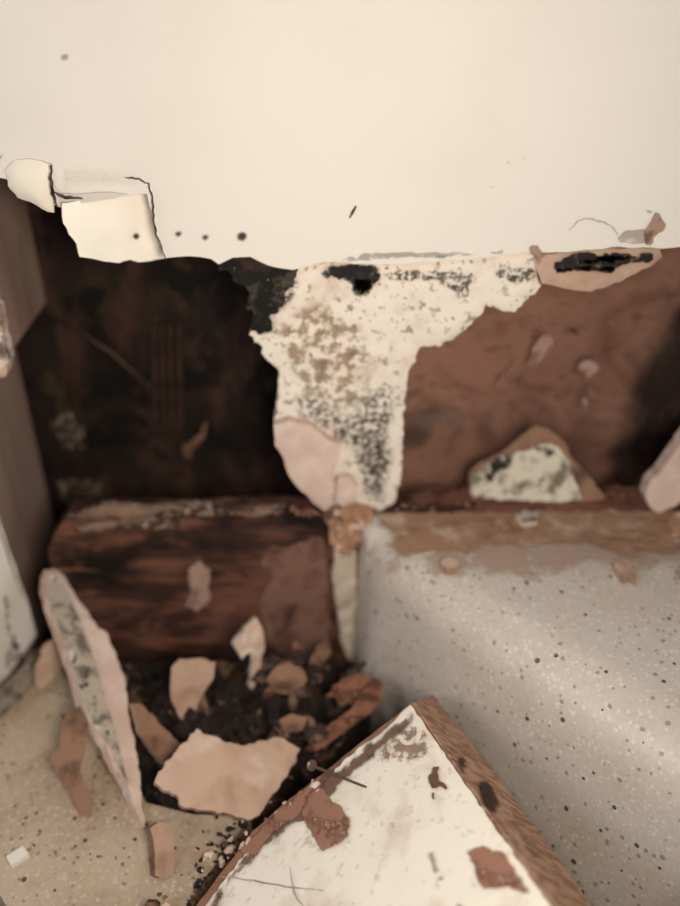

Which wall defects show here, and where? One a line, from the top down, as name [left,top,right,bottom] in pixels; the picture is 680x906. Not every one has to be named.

leakage [275,277,297,310]
mould [322,264,473,297]
mould [499,268,535,283]
spalling [530,211,666,292]
mould [554,252,653,273]
spalling [0,158,357,530]
mould [282,308,392,501]
spalling [515,509,538,528]
spalling [440,556,458,575]
peeling [258,536,331,656]
peeling [18,623,62,690]